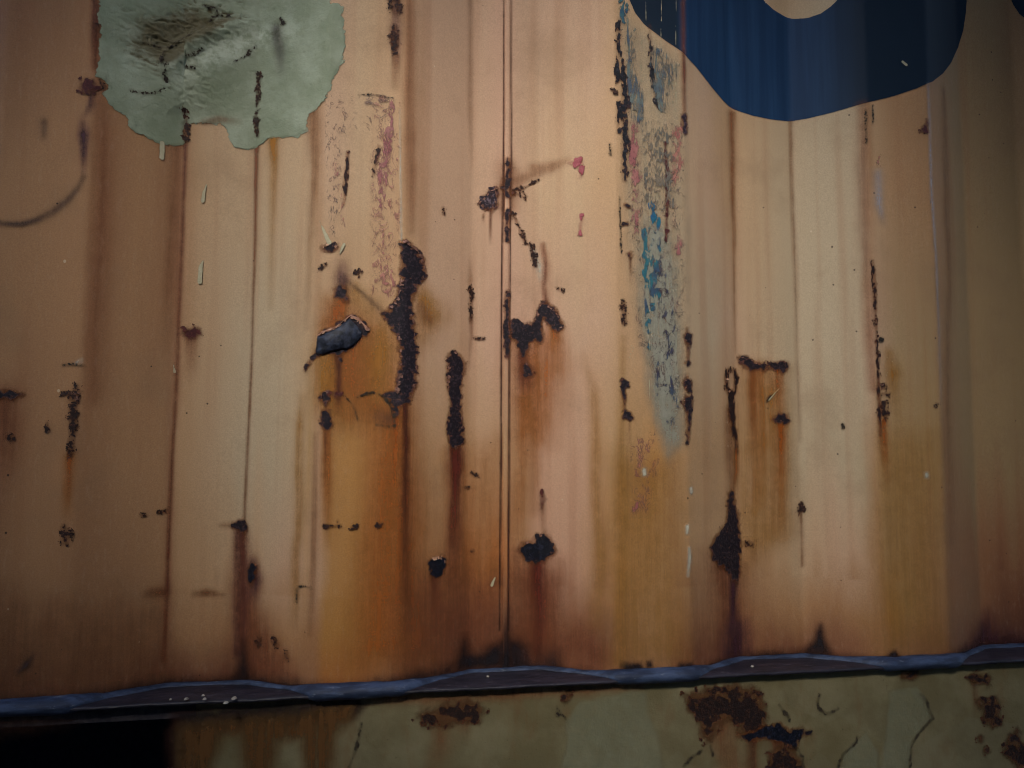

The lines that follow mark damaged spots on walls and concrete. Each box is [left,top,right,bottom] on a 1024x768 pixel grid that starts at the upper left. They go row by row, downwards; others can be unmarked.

peeling [613,20,631,181]
corrosion [59,381,83,498]
corrosion [377,11,561,682]
peeling [620,377,633,421]
corrosion [724,366,740,484]
corrosion [383,690,525,730]
corrosion [680,683,803,768]
corrosion [964,669,1024,768]